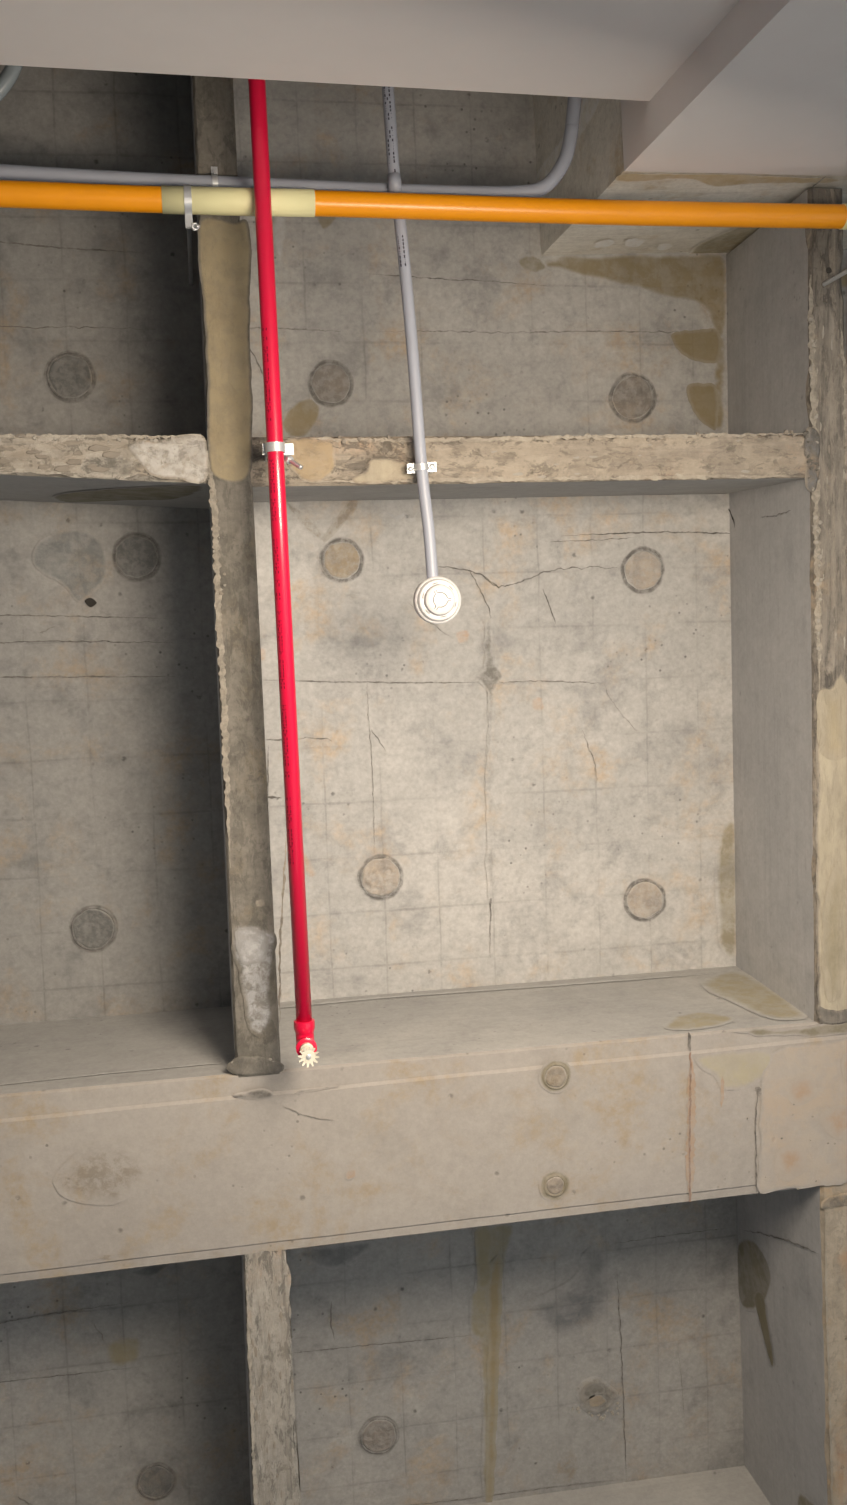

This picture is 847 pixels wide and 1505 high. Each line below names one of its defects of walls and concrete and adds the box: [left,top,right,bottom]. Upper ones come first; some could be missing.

leakage [517,227,759,433]
crack [267,510,791,942]
leakage [816,682,847,760]
crack [0,1302,137,1383]
leakage [468,1223,515,1503]
leakage [737,1237,773,1367]